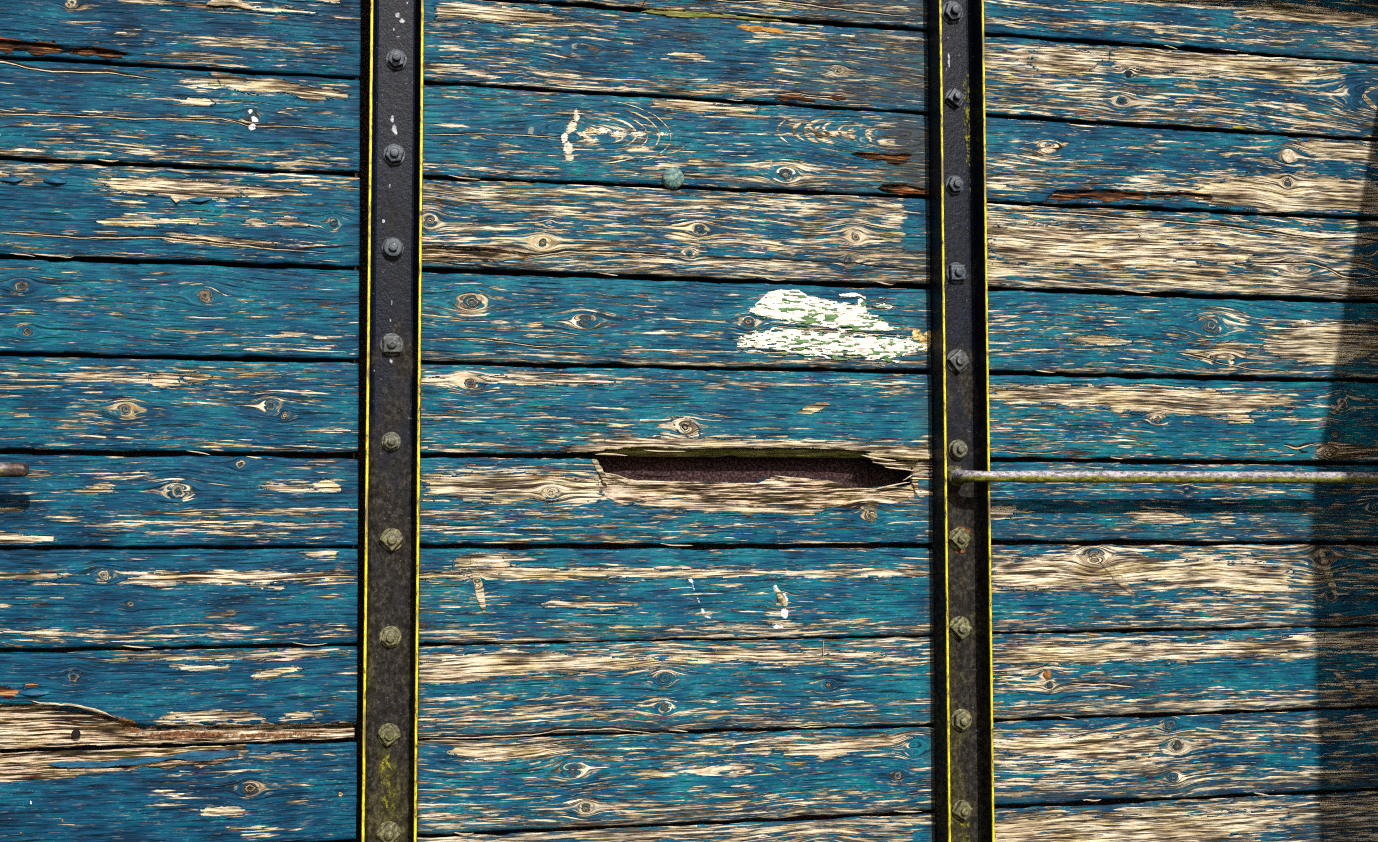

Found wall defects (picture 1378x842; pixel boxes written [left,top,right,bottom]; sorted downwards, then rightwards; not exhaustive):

peeling [0,682,50,700]
peeling [159,708,315,722]
peeling [49,750,240,768]